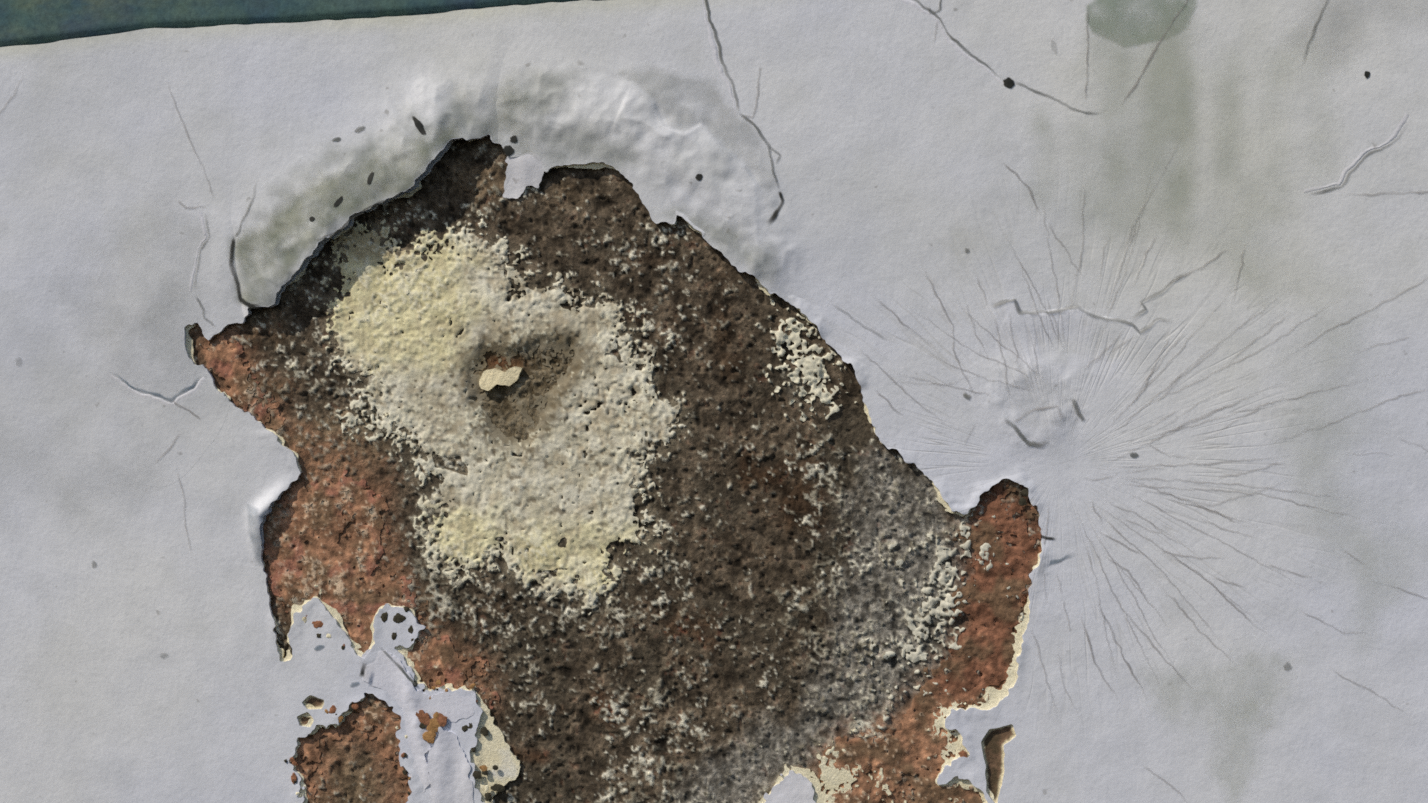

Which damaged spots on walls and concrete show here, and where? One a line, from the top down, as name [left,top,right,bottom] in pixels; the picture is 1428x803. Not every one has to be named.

crack [900,0,1046,96]
crack [1133,41,1160,89]
crack [702,0,784,221]
crack [995,299,1151,333]
crack [1013,400,1084,447]
spalling [185,135,1042,803]
crack [1041,535,1066,565]